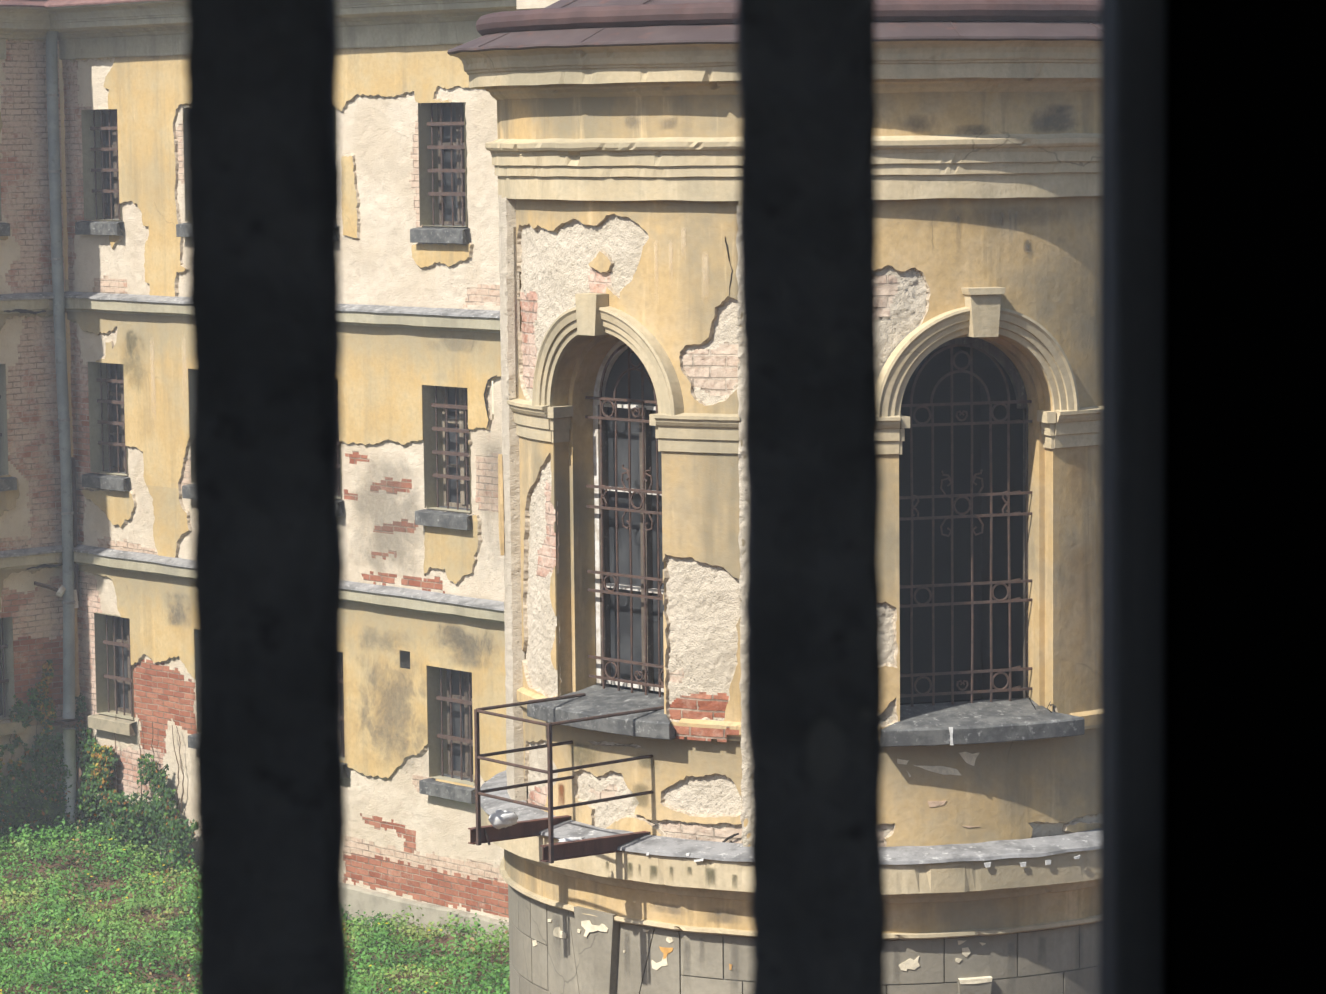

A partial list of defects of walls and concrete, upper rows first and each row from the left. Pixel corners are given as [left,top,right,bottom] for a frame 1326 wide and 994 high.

peeling [0,39,150,295]
peeling [173,103,189,297]
peeling [0,312,158,555]
peeling [175,438,194,560]
peeling [338,86,649,602]
peeling [522,206,751,862]
peeling [877,265,931,374]
peeling [0,566,199,873]
peeling [343,744,509,922]
peeling [898,956,920,971]
spalling [956,940,992,984]